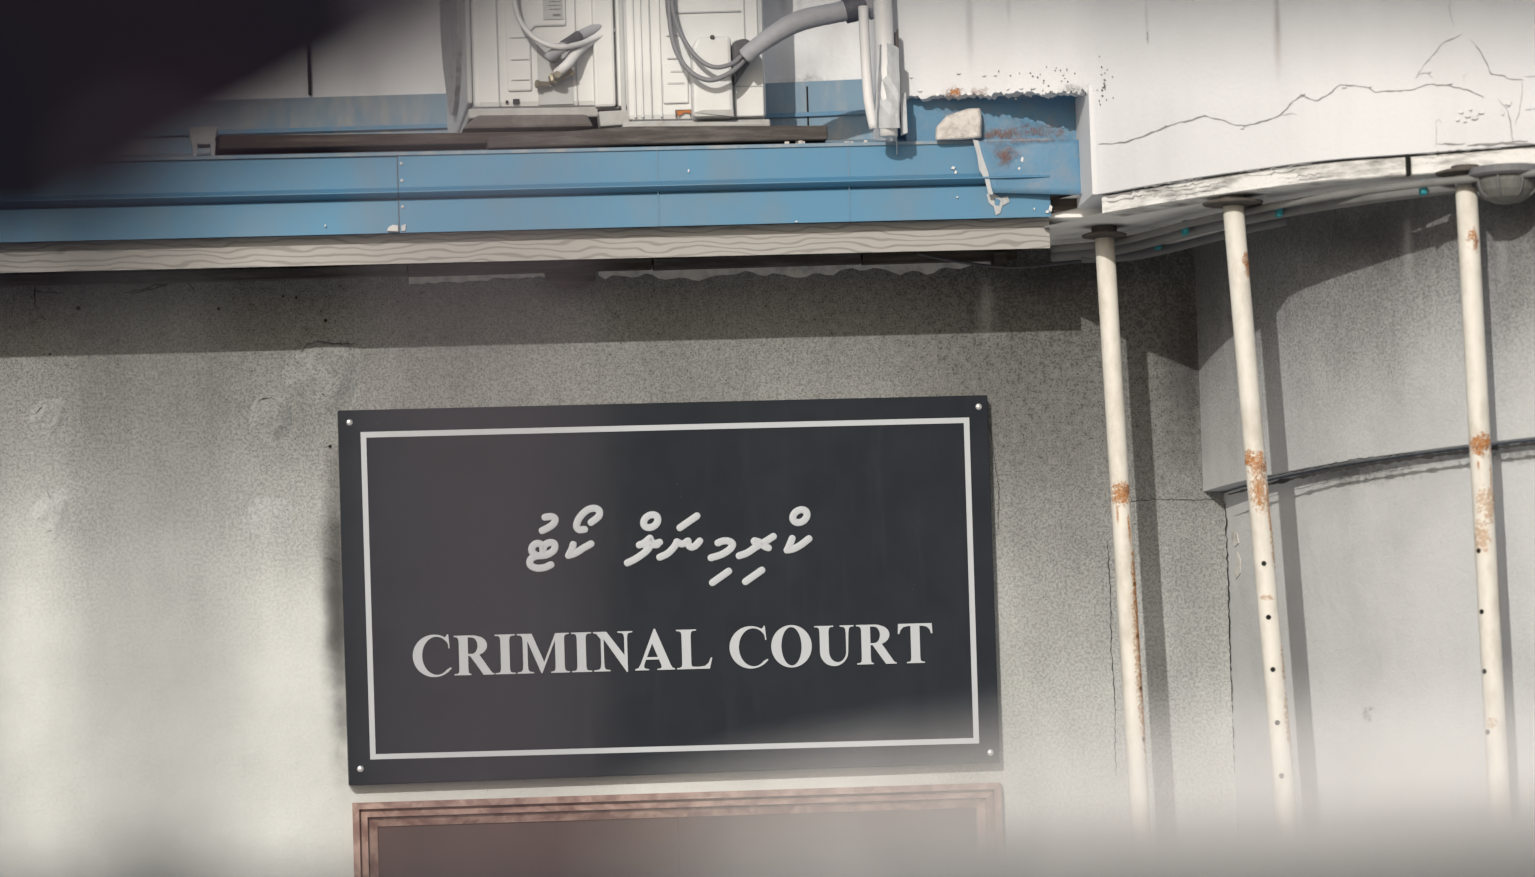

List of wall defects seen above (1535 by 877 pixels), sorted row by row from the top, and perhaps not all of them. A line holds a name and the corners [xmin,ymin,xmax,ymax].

crack [1100,10,1535,147]
rust [1245,450,1271,528]
rust [1469,432,1495,501]
rust [1112,484,1147,761]